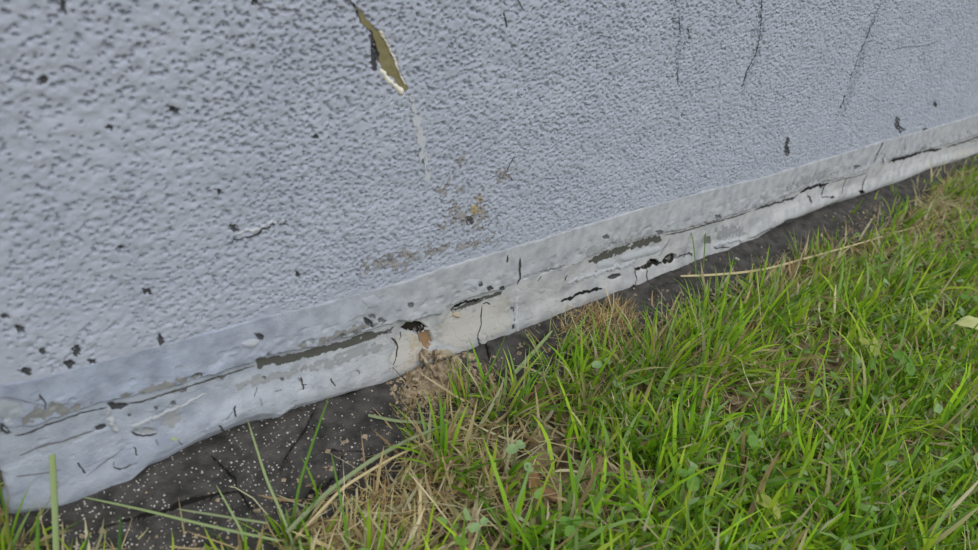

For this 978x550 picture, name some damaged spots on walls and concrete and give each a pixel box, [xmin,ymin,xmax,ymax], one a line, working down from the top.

spalling [356,6,408,95]
crack [756,137,978,210]
crack [230,223,288,243]
crack [507,256,602,302]
crack [634,241,692,285]
crack [391,332,401,376]
spalling [401,321,454,373]
crack [451,299,490,361]